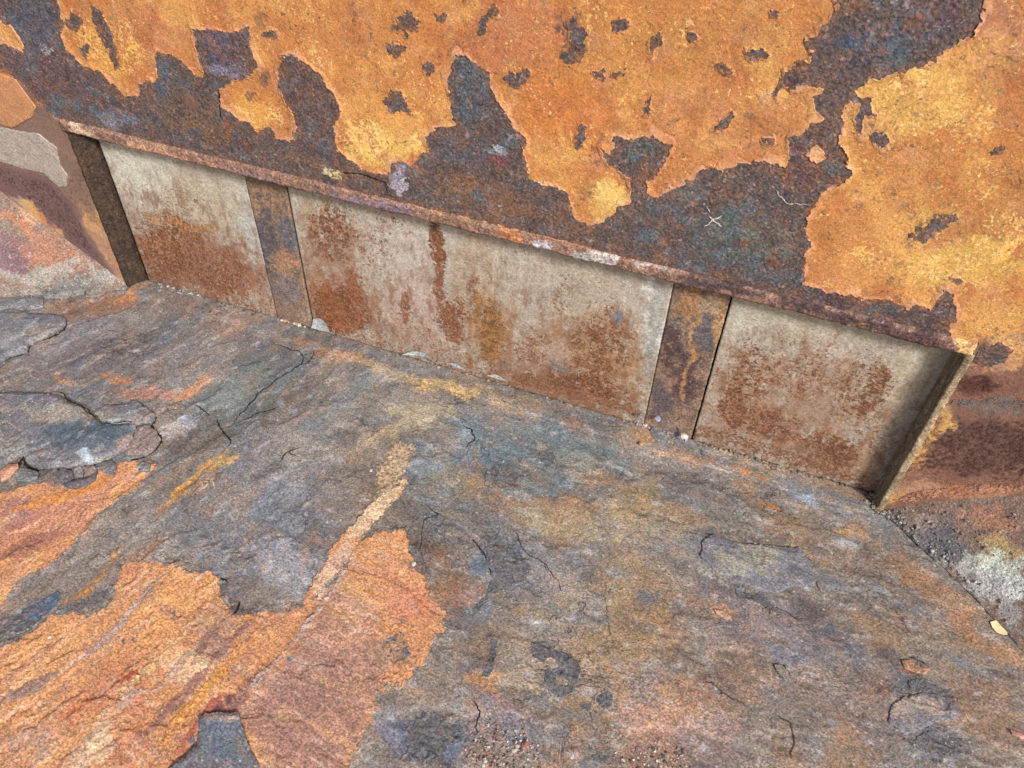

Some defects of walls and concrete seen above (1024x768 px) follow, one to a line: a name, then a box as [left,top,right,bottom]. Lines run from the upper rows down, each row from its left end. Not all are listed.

rust [0,74,97,258]
crack [5,325,67,361]
rust [313,226,504,365]
peeling [0,463,40,483]
peeling [57,460,117,484]
crack [18,390,163,485]
crack [197,342,314,445]
rust [703,428,864,486]